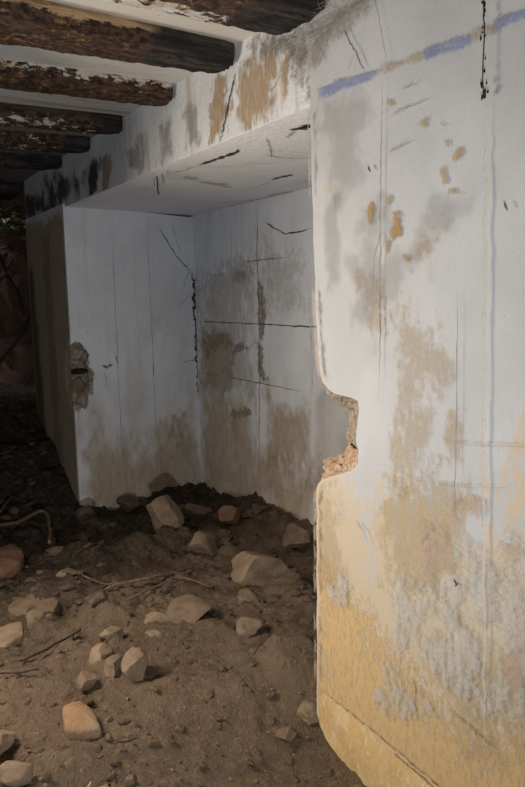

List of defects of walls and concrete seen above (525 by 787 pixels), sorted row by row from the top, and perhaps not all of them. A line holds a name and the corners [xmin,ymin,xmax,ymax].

crack [200,75,239,165]
spalling [70,342,94,412]
crack [160,223,317,453]
spalling [312,291,359,480]
leakage [94,414,192,510]
leakage [204,401,312,518]
leakage [318,555,525,787]